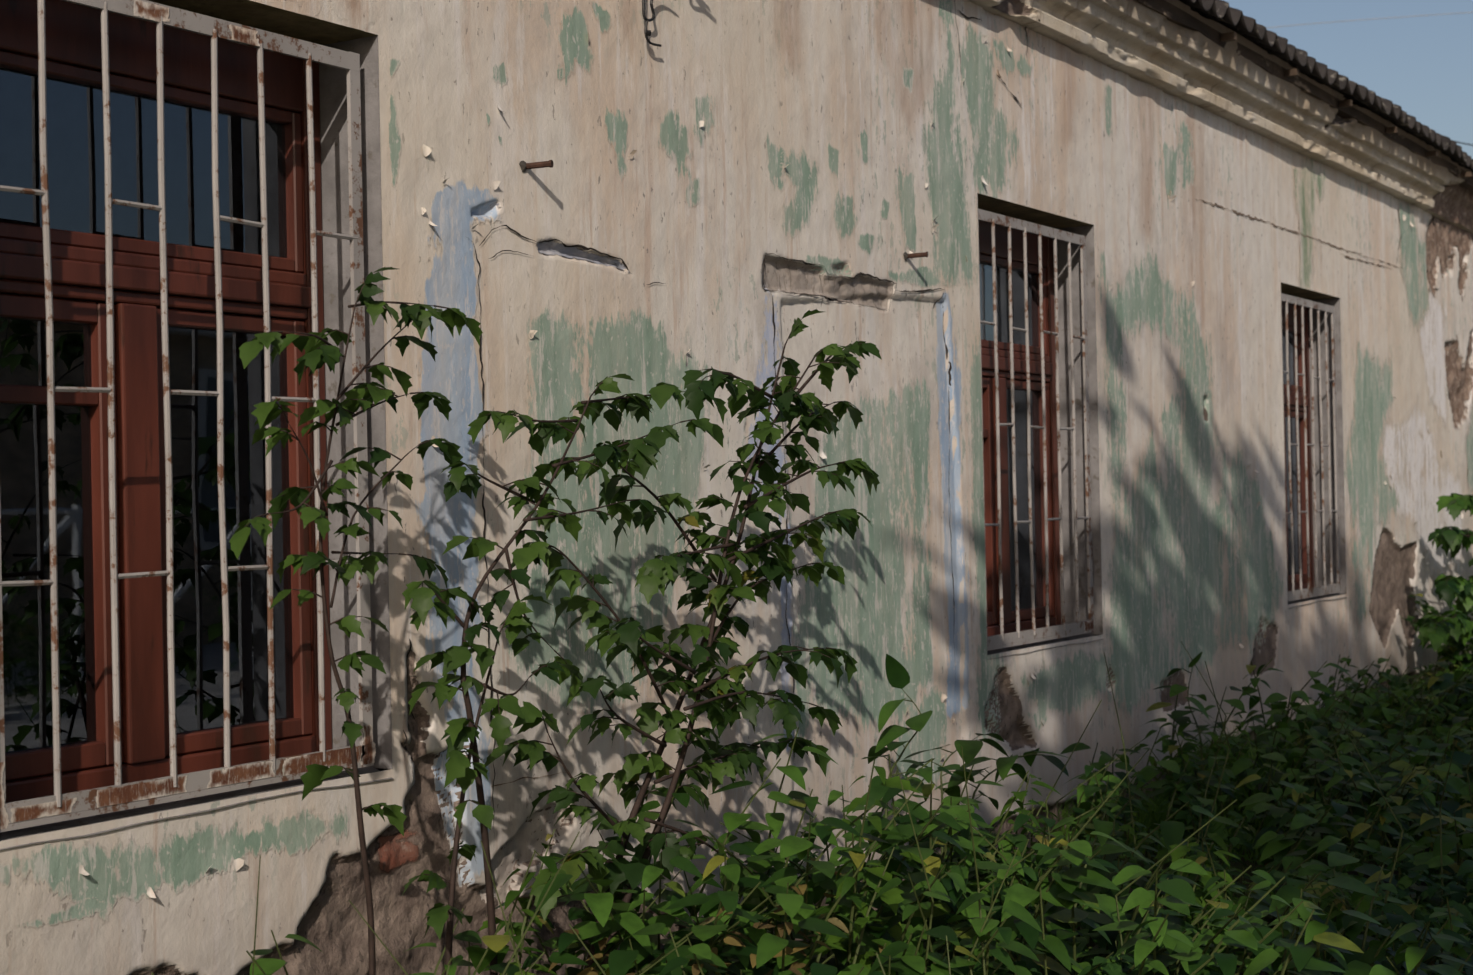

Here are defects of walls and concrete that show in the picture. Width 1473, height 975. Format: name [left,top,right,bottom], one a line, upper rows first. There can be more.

rust [133,0,170,22]
rust [229,24,260,46]
peeling [388,56,402,188]
peeling [486,61,508,145]
flaking render [537,241,630,273]
peeling [744,0,1284,794]
peeling [1344,199,1473,649]
peeling [414,177,502,888]
rust [0,762,77,830]
rust [96,776,187,808]
rust [207,725,376,788]
peeling [0,804,349,929]